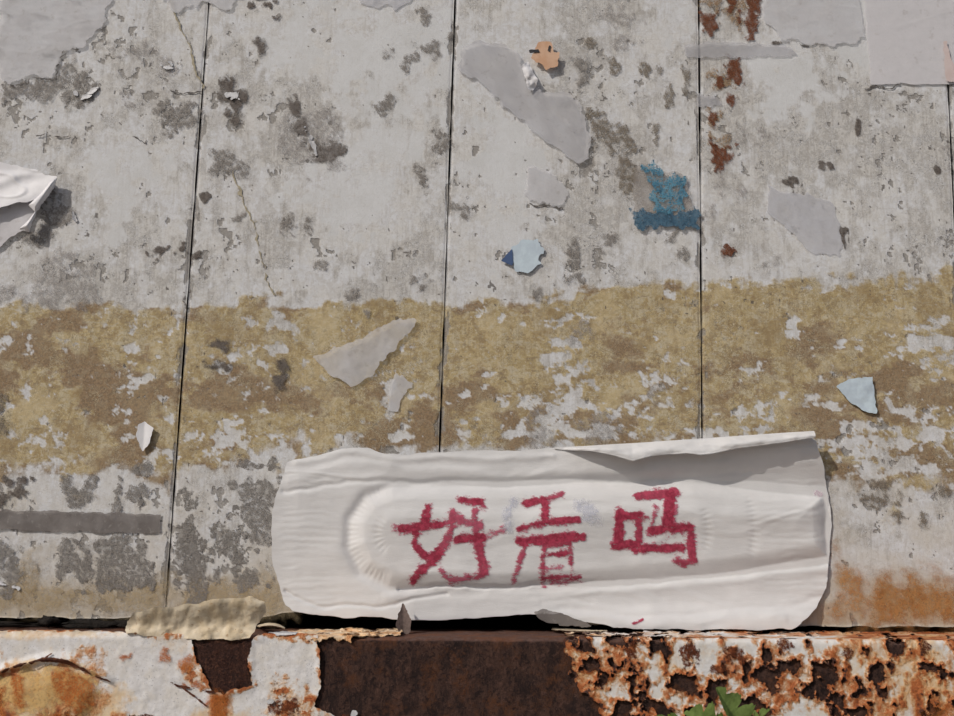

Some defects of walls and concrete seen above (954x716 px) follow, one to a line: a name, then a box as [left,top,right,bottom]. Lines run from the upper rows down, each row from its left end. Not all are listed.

rust [698,0,761,41]
rust [706,57,745,172]
peeling [564,237,585,284]
rust [721,243,737,257]
peeling [197,339,232,372]
peeling [272,359,290,392]
peeling [859,479,905,523]
peeling [0,456,404,716]
rust [832,568,954,625]
rust [678,637,746,674]